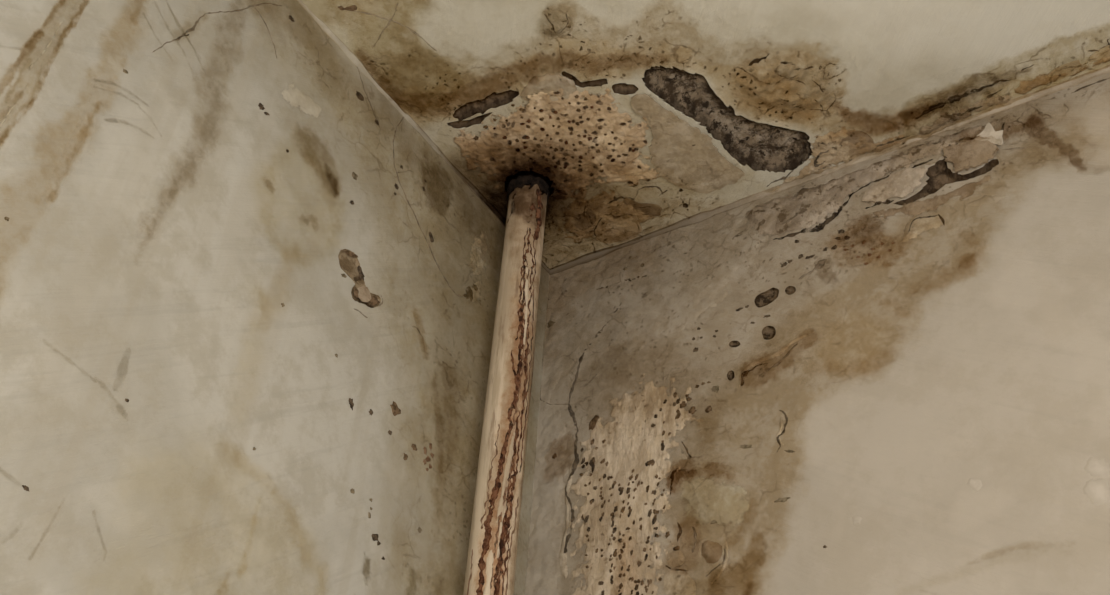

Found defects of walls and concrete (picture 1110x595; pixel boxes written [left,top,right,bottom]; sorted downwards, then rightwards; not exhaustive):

water stain [484,160,565,242]
peeling [338,249,383,318]
crack [540,304,621,579]